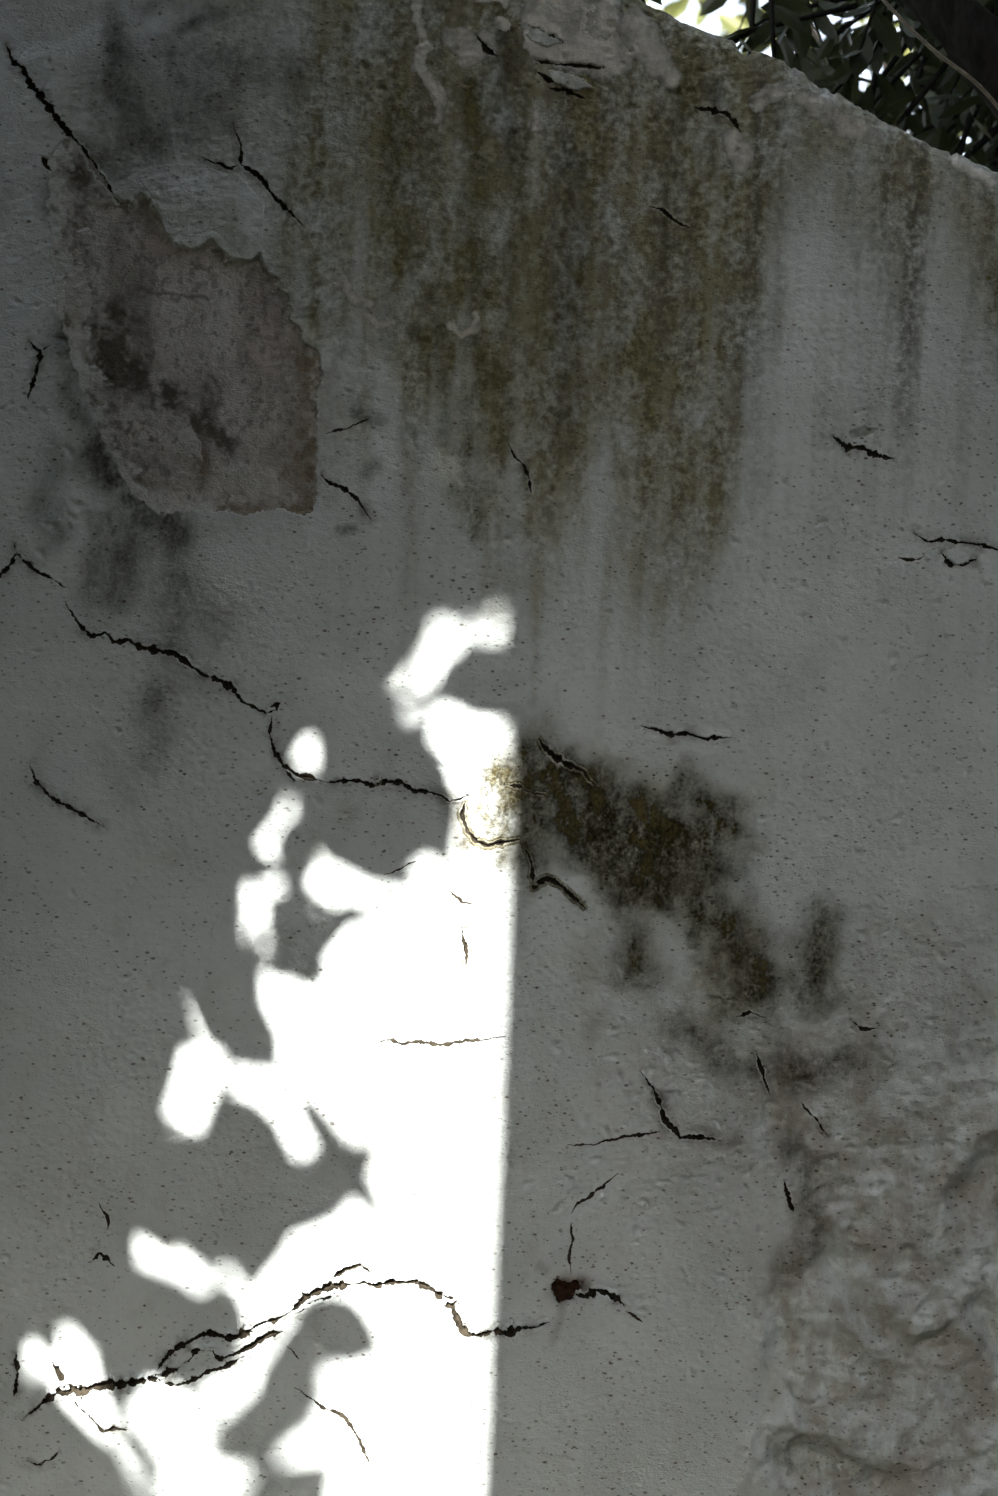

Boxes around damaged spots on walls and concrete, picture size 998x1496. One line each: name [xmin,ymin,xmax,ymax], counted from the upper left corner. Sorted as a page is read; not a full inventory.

crack [2,44,123,206]
leakage [410,0,681,292]
peeling [548,70,592,91]
leakage [723,128,754,175]
leakage [749,82,883,144]
leakage [947,154,997,188]
spalling [42,136,323,516]
crack [0,544,596,911]
crack [445,888,478,968]
leakage [567,769,689,986]
crack [375,1036,506,1047]
crack [10,1069,723,1470]